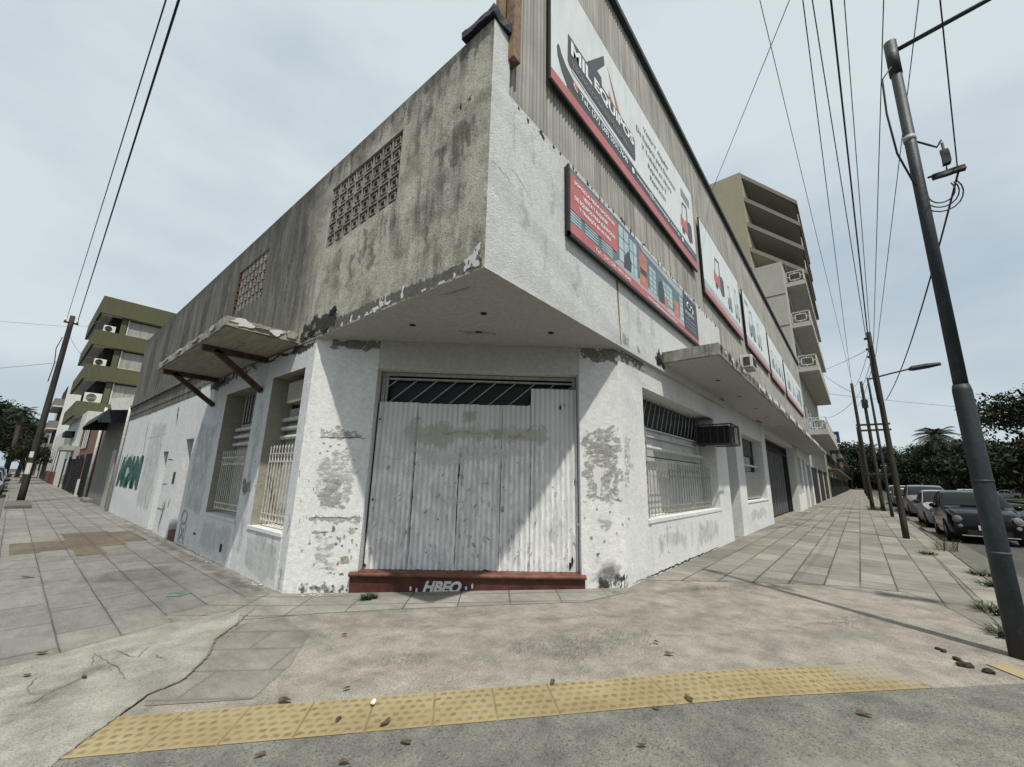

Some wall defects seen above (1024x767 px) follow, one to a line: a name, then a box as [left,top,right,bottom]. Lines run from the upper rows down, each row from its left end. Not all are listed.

damp [329,257,482,352]
peeling [464,242,482,272]
peeling [298,425,410,593]
peeling [580,425,632,513]
crack [4,605,254,759]